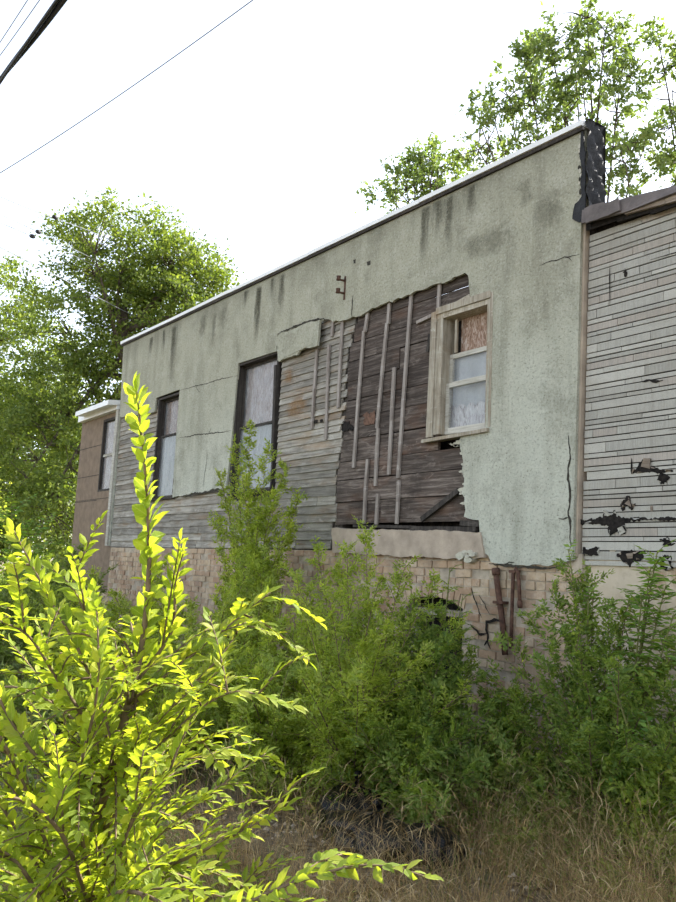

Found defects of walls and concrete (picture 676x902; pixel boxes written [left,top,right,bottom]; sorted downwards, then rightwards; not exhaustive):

water stain [422,197,452,238]
peeling [603,497,639,535]